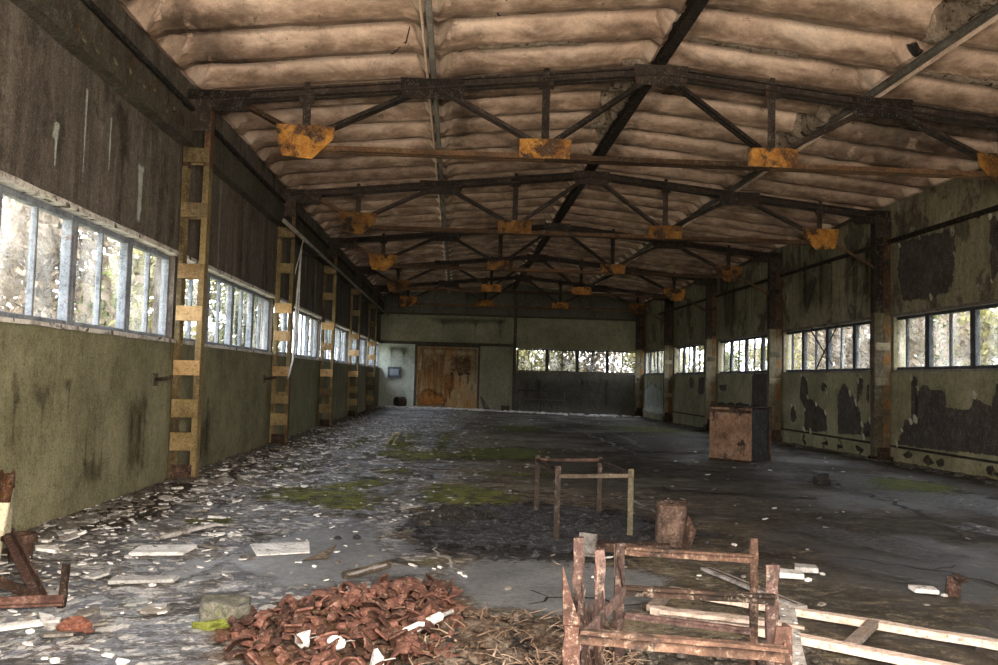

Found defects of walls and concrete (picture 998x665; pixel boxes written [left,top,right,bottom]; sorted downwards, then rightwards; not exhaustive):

peeling [896,226,956,303]
peeling [986,213,998,283]
rust [418,355,471,406]
peeling [789,374,870,440]
peeling [895,374,998,477]